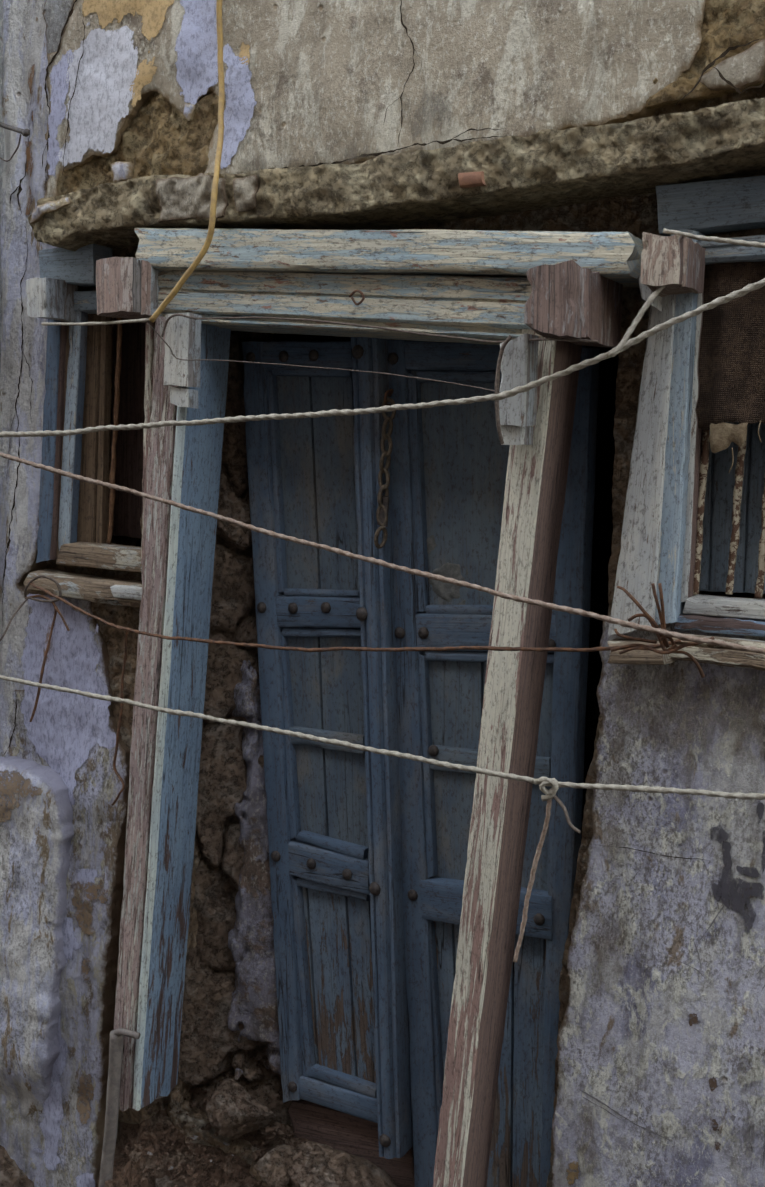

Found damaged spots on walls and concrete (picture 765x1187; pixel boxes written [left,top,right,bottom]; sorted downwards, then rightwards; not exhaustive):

peeling [43,0,257,196]
peeling [69,868,110,936]